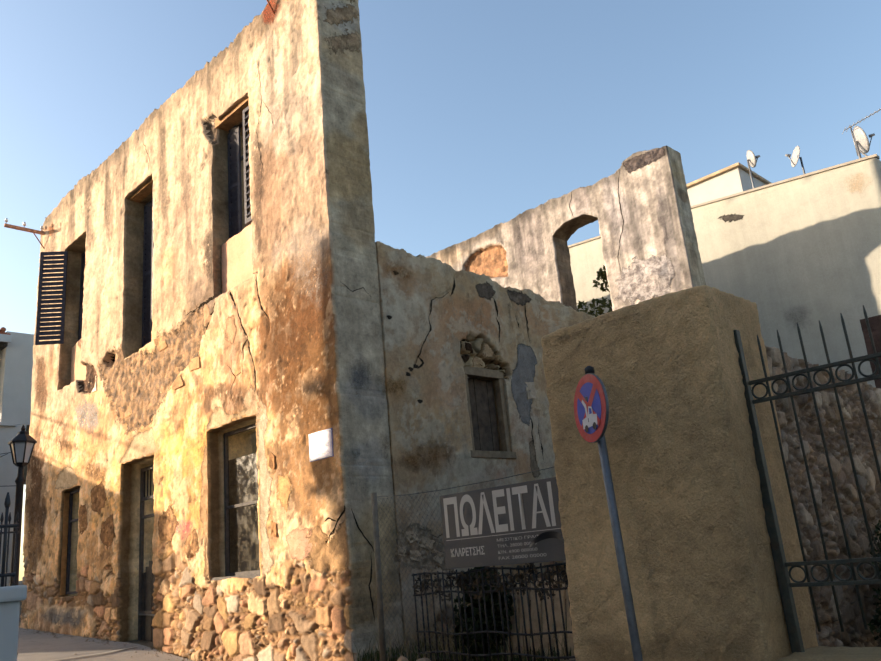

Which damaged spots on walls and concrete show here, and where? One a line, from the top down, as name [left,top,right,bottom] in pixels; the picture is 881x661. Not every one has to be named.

rust [263,0,278,22]
spalling [323,0,361,54]
crack [617,171,625,272]
spalling [718,214,744,223]
crack [185,292,256,403]
crack [253,272,270,333]
crack [412,275,456,371]
spalling [464,245,508,300]
spalling [460,338,537,426]
spalling [507,290,531,306]
leakage [26,454,46,571]
crack [325,506,375,622]